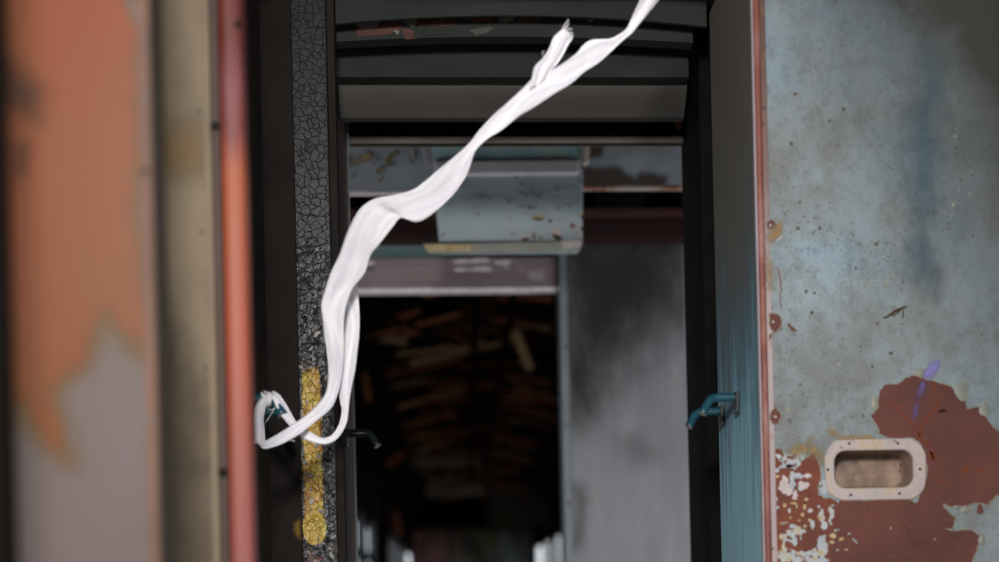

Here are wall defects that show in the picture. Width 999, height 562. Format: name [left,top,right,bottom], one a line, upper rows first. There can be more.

peeling [355,19,456,40]
peeling [468,17,540,36]
peeling [769,405,782,424]
peeling [772,369,999,562]